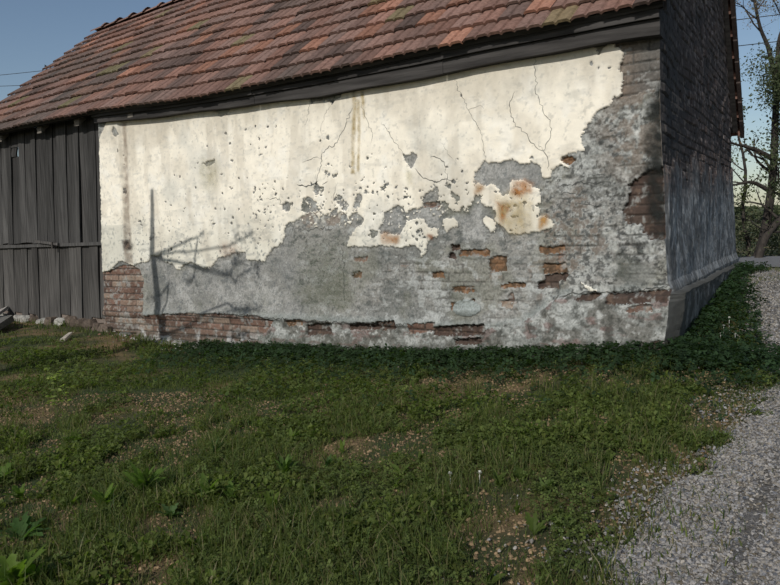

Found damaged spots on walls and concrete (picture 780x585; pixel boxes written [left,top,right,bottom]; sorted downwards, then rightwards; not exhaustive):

flaking render [98,123,119,165]
crack [299,105,402,197]
flaking render [102,38,741,350]
crack [417,145,453,183]